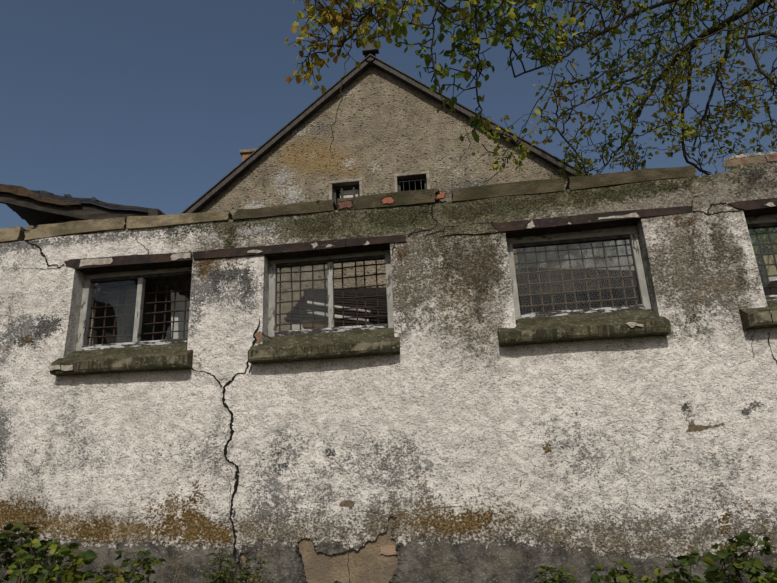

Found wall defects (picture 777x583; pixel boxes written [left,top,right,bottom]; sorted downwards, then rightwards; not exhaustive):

spalling [722,151,777,170]
crack [381,191,498,256]
crack [13,225,67,269]
water stain [10,315,64,348]
peeling [687,420,724,432]
crack [189,319,272,583]
spalling [294,504,477,583]